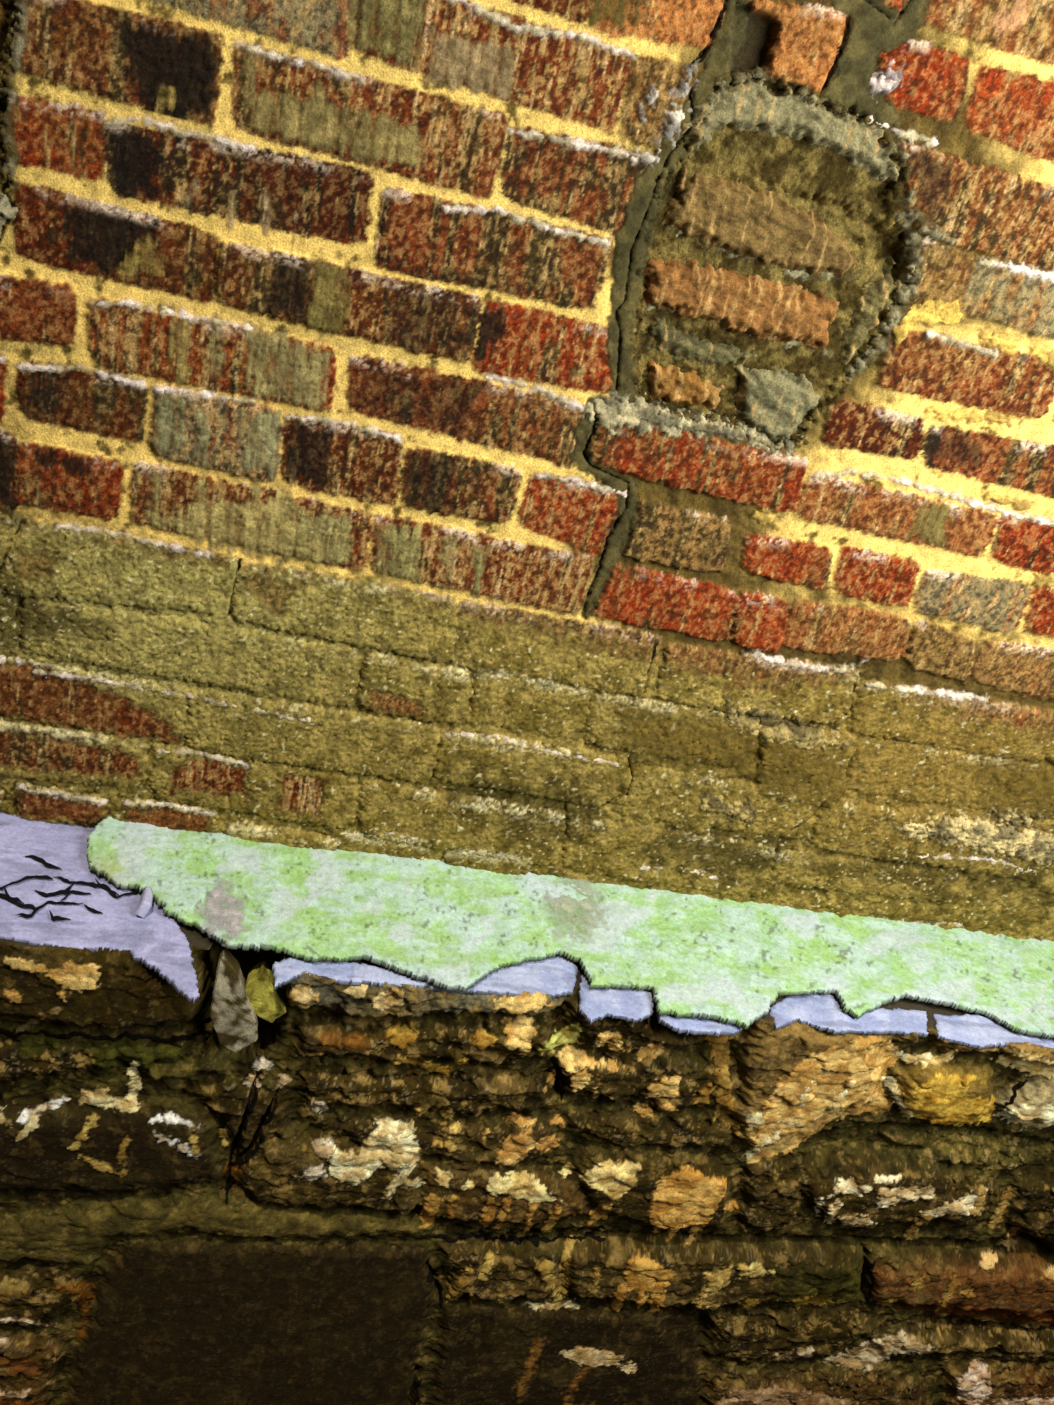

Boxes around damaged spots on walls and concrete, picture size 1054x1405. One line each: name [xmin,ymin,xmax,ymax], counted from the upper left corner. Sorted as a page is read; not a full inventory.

crack [821,0,931,128]
crack [571,0,750,620]
spalling [633,66,955,456]
crack [0,855,139,921]
crack [225,1081,278,1204]
peeling [243,1057,292,1089]
peeling [286,985,319,1009]
peeling [310,1101,328,1113]
peeling [343,984,404,1010]
peeling [386,991,668,1100]